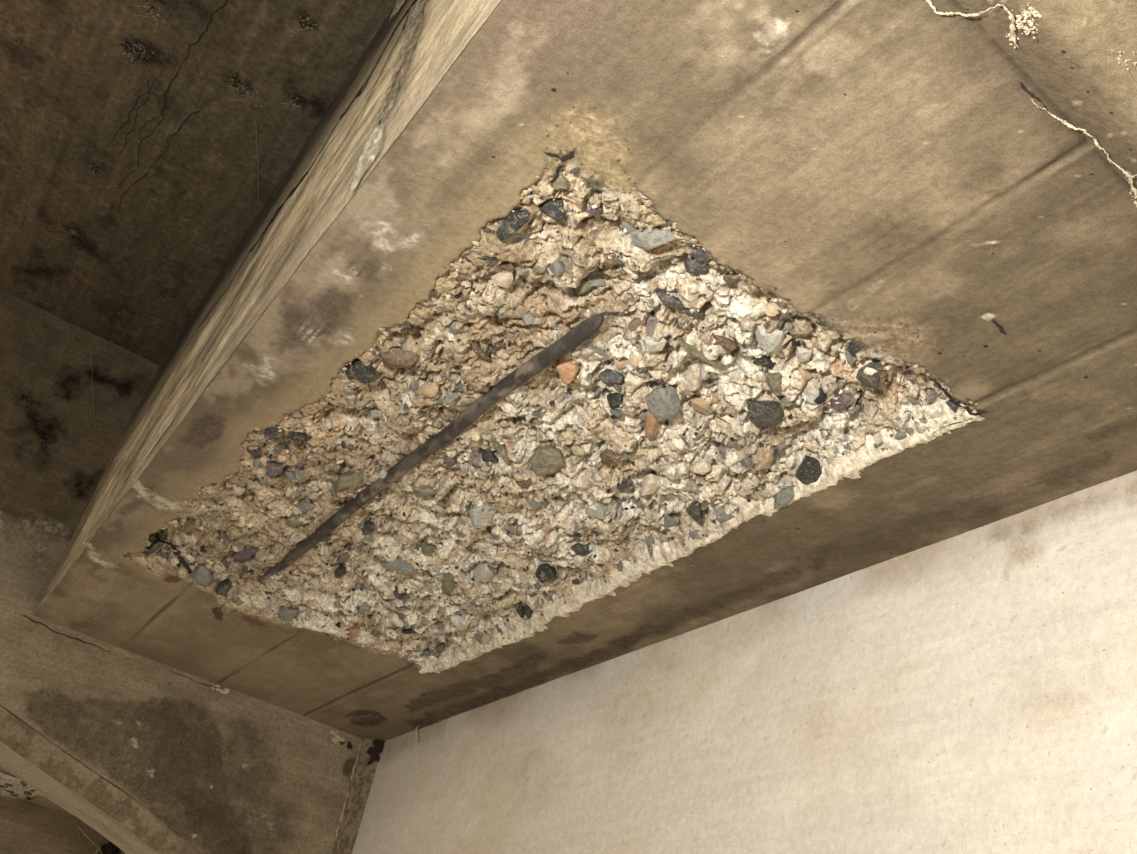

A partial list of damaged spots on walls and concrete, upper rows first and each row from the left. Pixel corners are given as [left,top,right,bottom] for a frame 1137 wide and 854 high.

crack [926,0,1042,48]
crack [1020,82,1137,207]
crack [74,0,425,565]
spalling [123,104,986,675]
crack [991,319,1007,336]
leakage [405,621,672,726]
leakage [28,690,286,854]